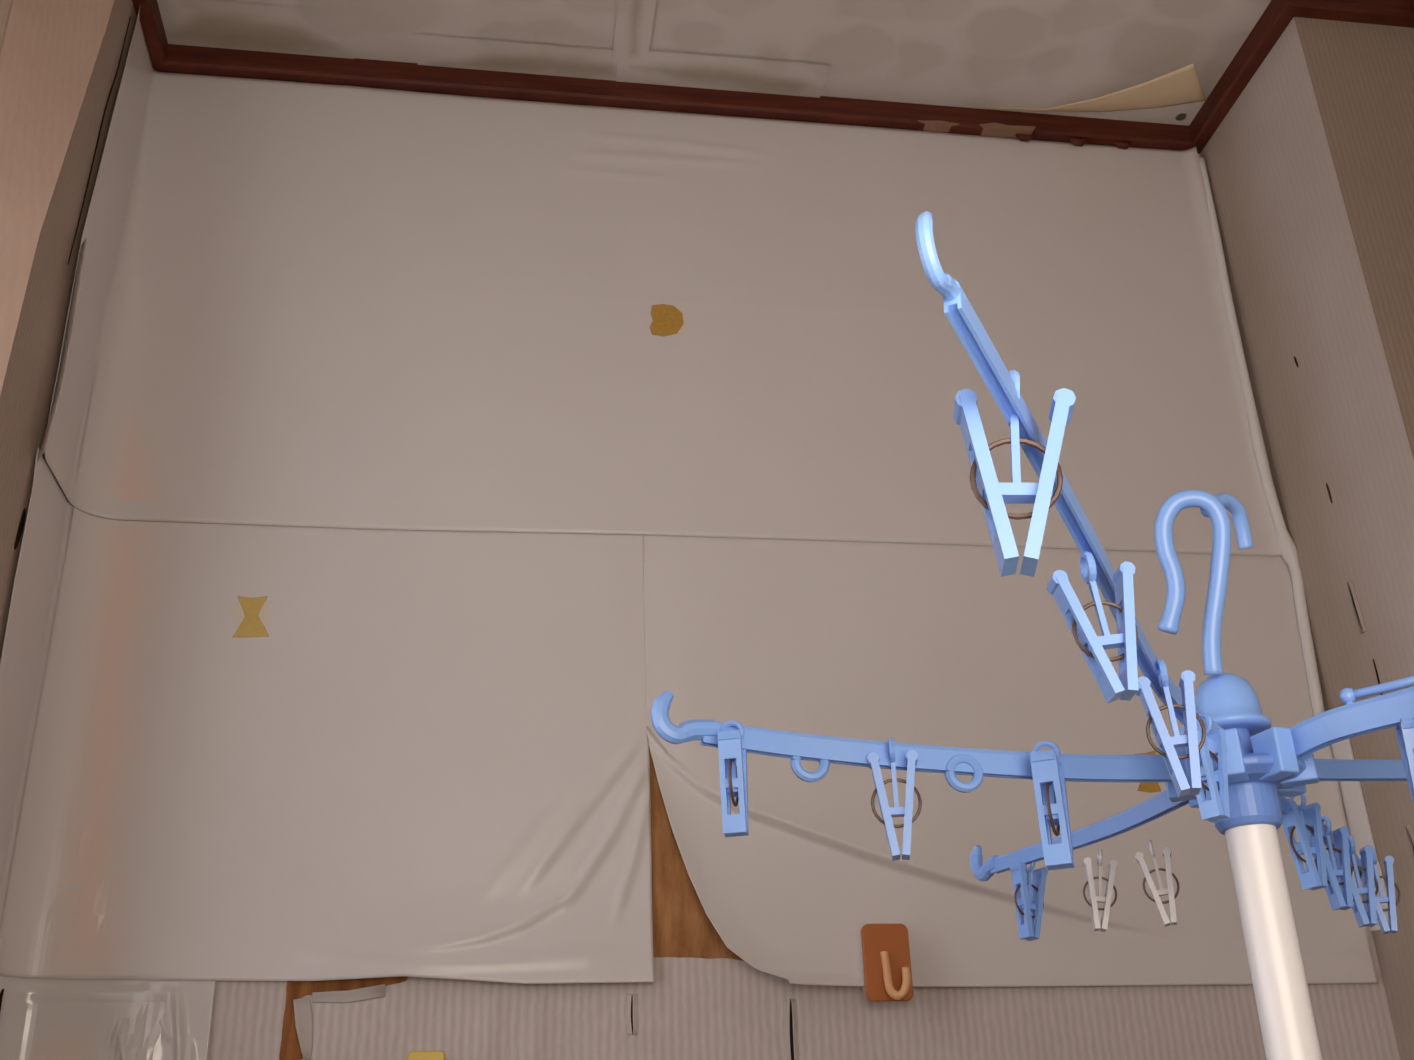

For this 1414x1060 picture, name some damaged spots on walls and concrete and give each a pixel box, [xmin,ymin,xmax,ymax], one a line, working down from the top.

peeling [649,747,744,961]
peeling [293,984,385,1060]